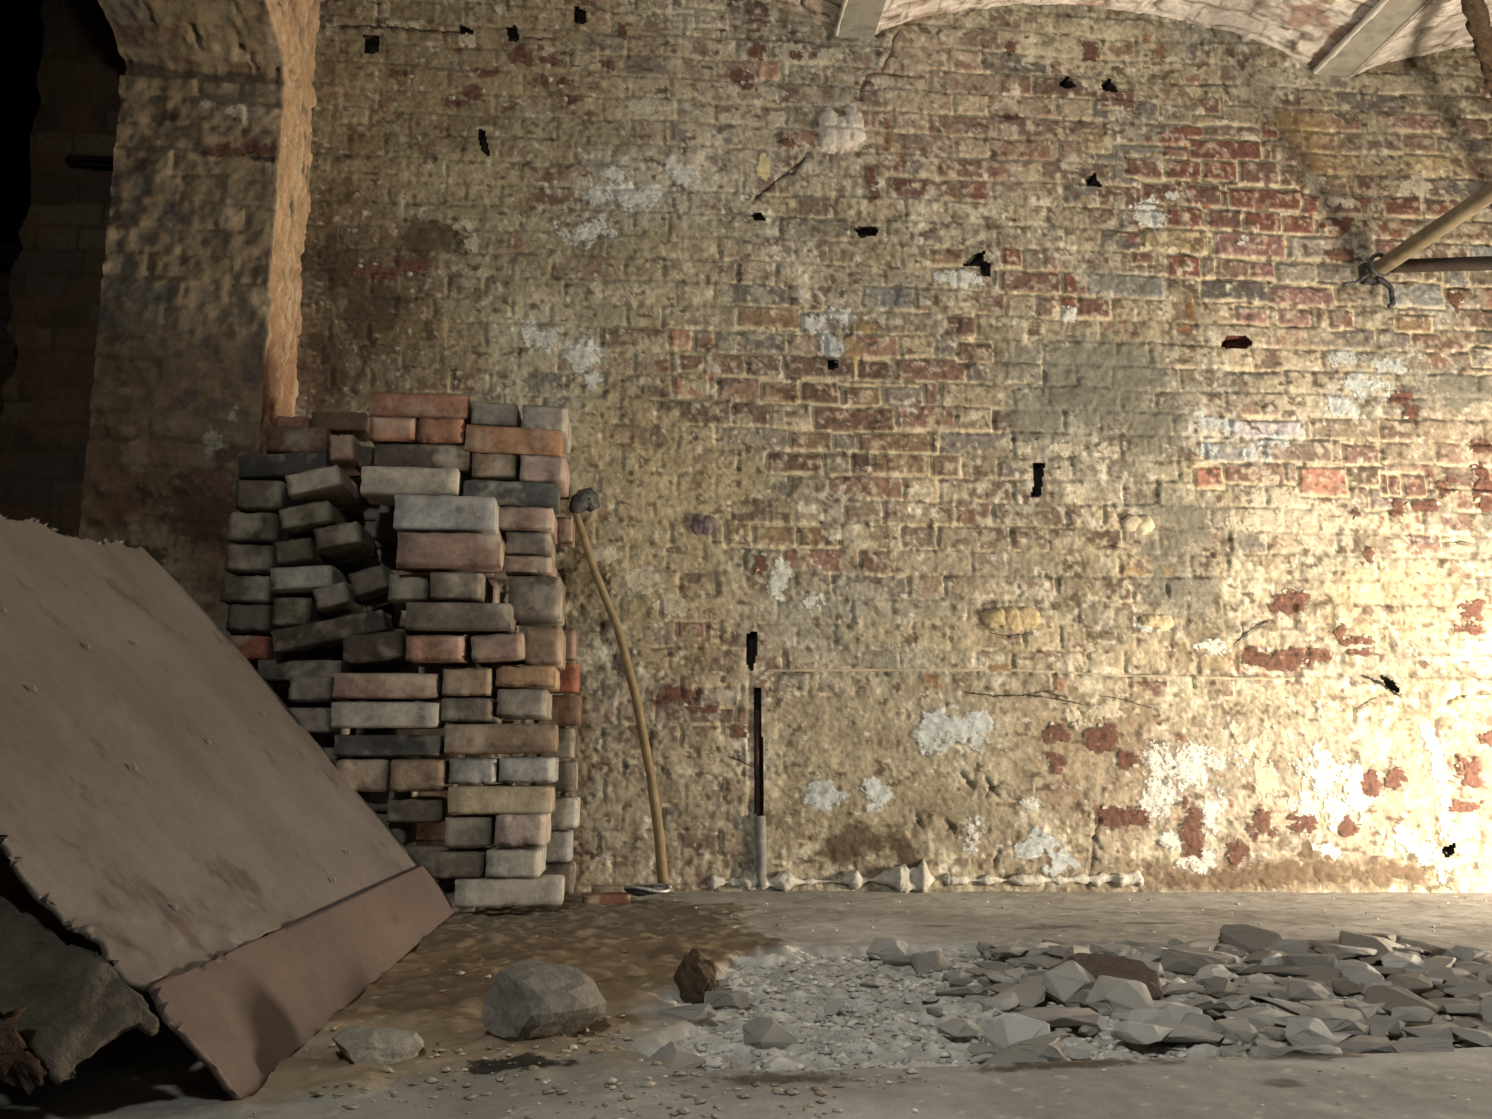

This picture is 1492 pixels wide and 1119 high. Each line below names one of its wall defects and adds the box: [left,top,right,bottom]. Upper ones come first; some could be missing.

leakage [554,151,715,250]
peeling [933,251,994,291]
spalling [1221,335,1252,349]
peeling [981,261,1190,497]
spalling [1390,439,1492,527]
spalling [1034,698,1140,775]
leakage [958,798,986,854]
leakage [1020,797,1040,811]
spalling [1179,790,1210,861]
spalling [1226,808,1362,865]
leakage [1135,720,1456,890]
spalling [1442,843,1455,858]